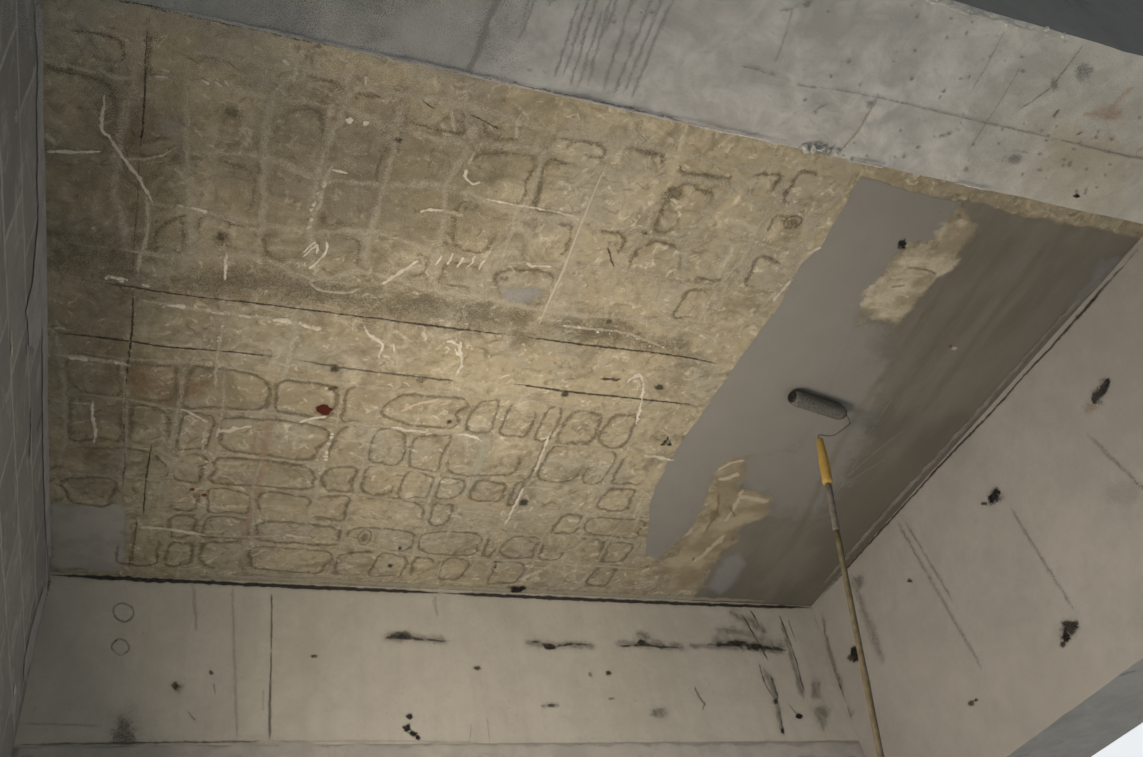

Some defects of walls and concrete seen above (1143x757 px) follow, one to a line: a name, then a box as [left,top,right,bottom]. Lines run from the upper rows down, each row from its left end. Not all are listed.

peeling [859,213,980,330]